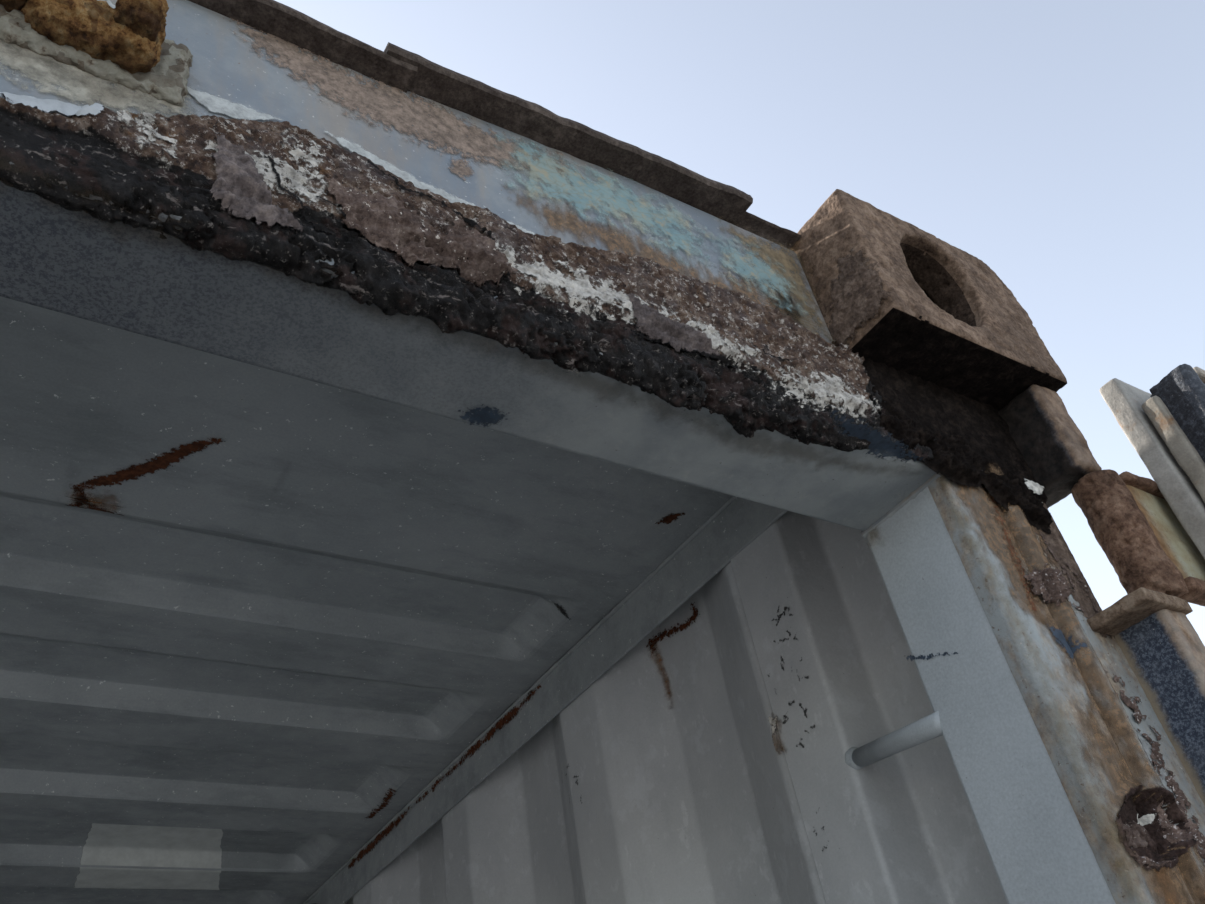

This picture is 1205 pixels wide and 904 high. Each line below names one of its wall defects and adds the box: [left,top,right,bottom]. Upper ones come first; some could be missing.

rust [0,92,105,117]
rust [209,133,304,232]
rust [327,178,519,286]
peeling [231,18,805,312]
rust [518,196,833,341]
rust [626,293,720,355]
rust [67,437,225,516]
rust [646,602,700,697]
rust [956,483,1205,904]